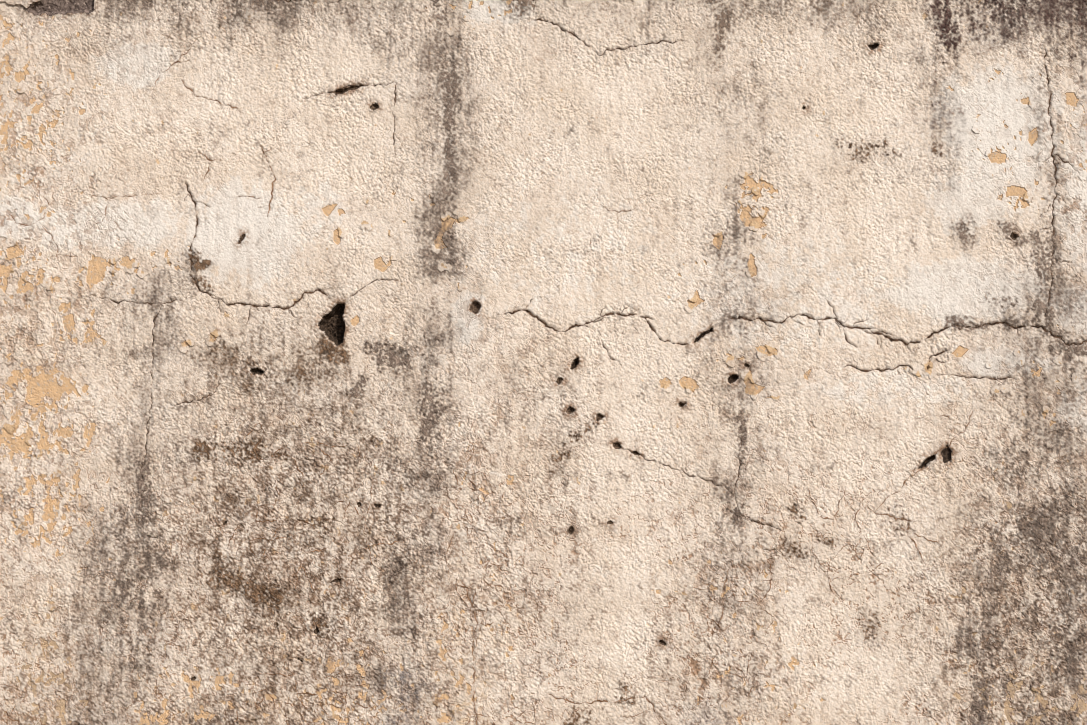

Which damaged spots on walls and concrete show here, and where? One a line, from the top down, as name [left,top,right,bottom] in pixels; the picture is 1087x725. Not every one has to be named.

peeling [0,0,95,152]
peeling [79,250,180,295]
crack [99,148,400,508]
spalling [318,303,359,346]
leakage [419,0,470,283]
crack [498,299,686,365]
crack [728,47,1087,380]
leakage [930,0,961,63]
leakage [972,0,1087,53]
leakage [985,221,1078,333]
peeling [0,353,96,557]
crack [610,411,973,696]